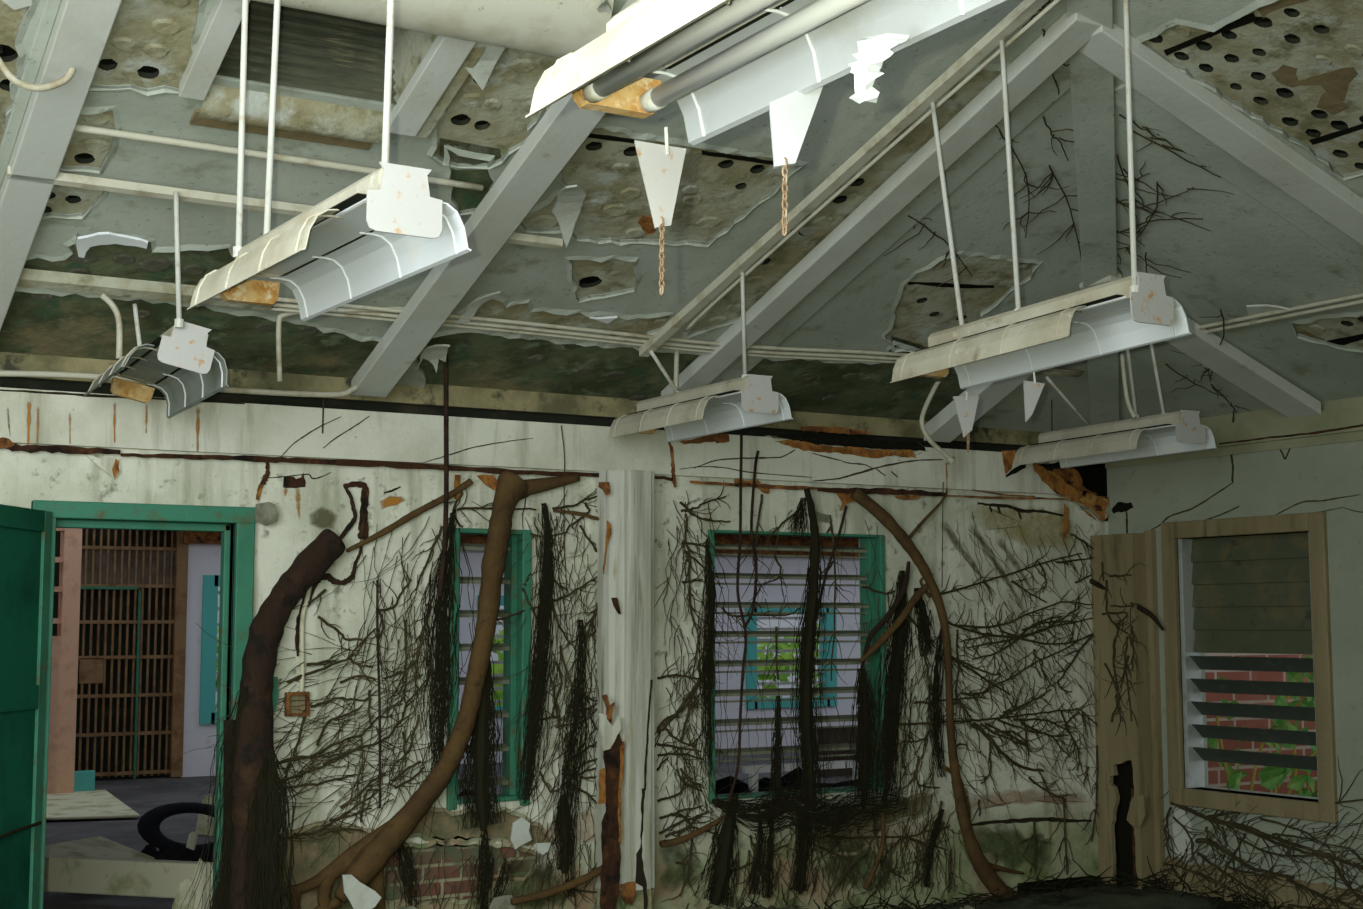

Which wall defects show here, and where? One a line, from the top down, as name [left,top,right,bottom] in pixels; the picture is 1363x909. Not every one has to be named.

peeling [552,184,586,248]
rust [27,403,39,445]
spalling [1001,450,1133,522]
spalling [598,694,636,909]